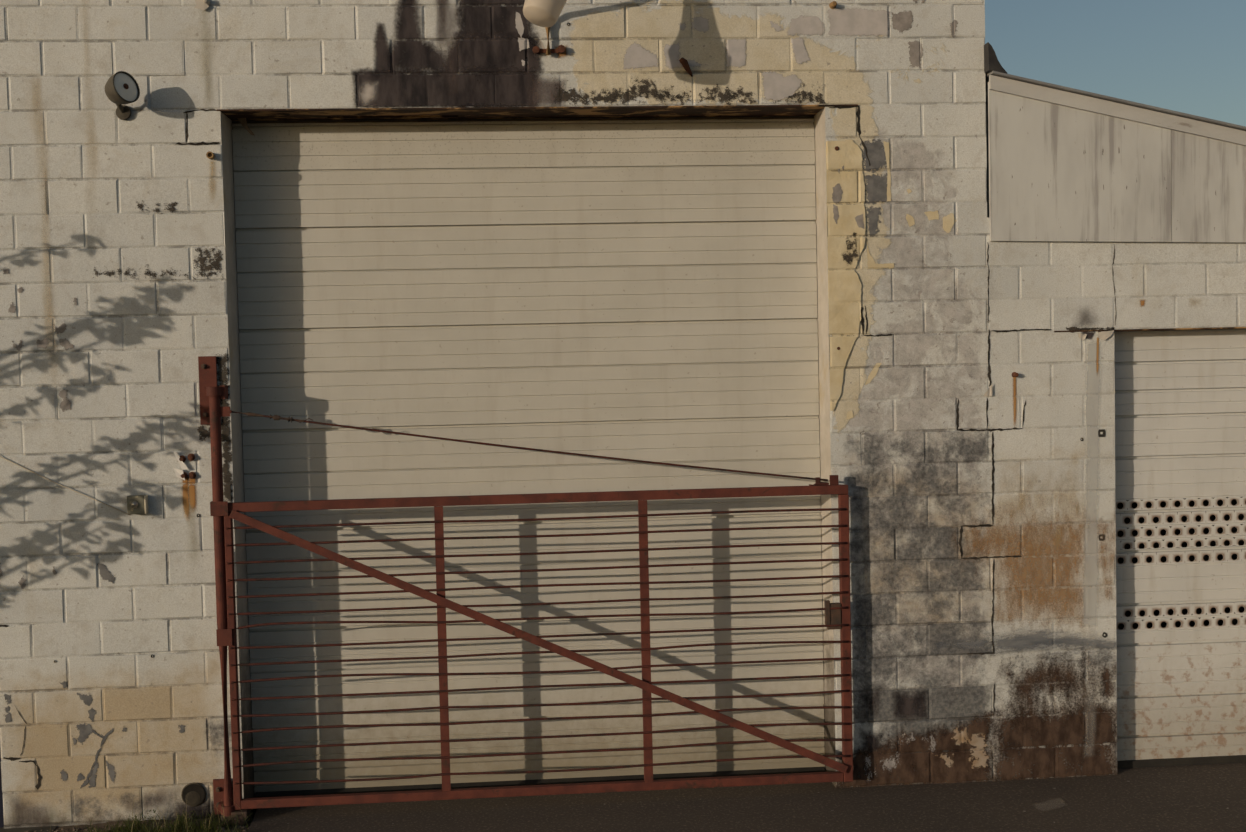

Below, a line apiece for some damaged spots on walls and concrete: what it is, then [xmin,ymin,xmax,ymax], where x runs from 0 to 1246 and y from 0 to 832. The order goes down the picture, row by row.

leakage [352,0,756,108]
peeling [891,0,925,68]
leakage [772,84,825,105]
peeling [826,139,894,420]
crack [956,242,1052,655]
rust [182,477,196,517]
leakage [936,631,1117,666]
peeling [60,681,105,745]
mould [866,692,927,719]
peeling [60,758,116,788]
mould [863,732,882,750]
peeling [864,727,989,781]